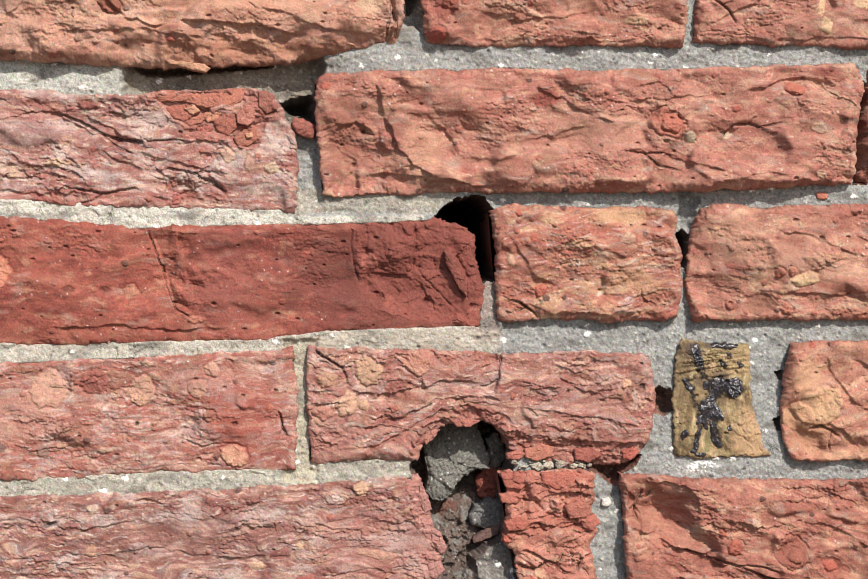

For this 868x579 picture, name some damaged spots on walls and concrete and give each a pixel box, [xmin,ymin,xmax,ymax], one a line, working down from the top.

spalling [350,217,485,327]
spalling [401,404,650,579]